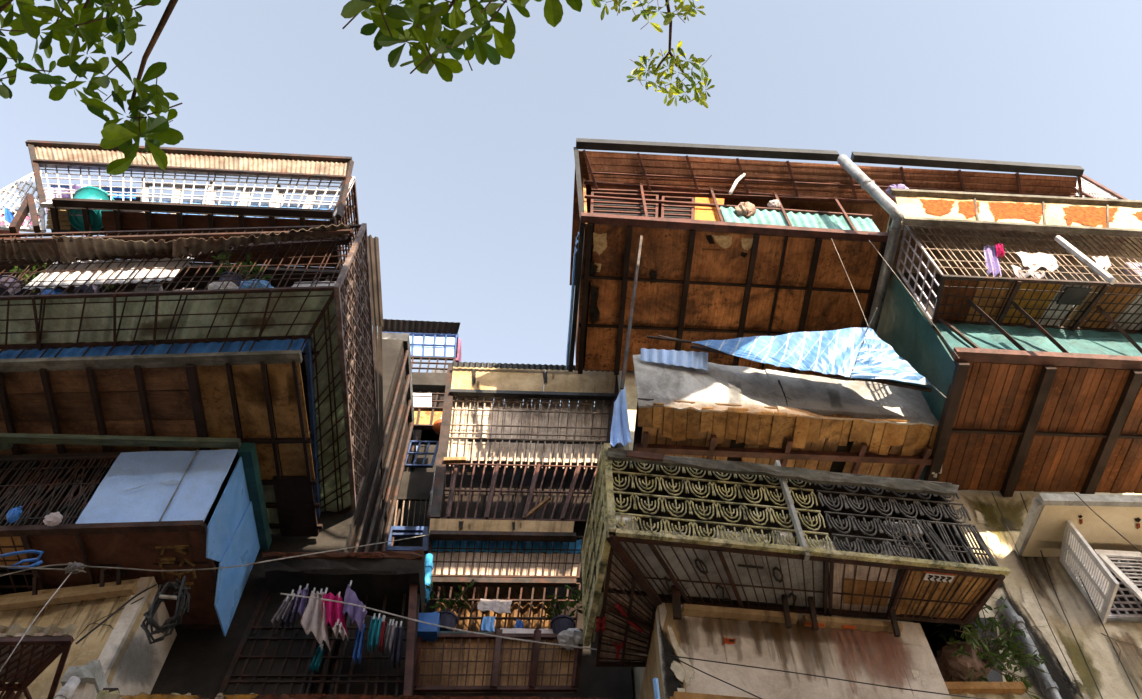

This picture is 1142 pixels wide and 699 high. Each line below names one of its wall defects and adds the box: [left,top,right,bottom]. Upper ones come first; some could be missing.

damp [708,617,905,678]